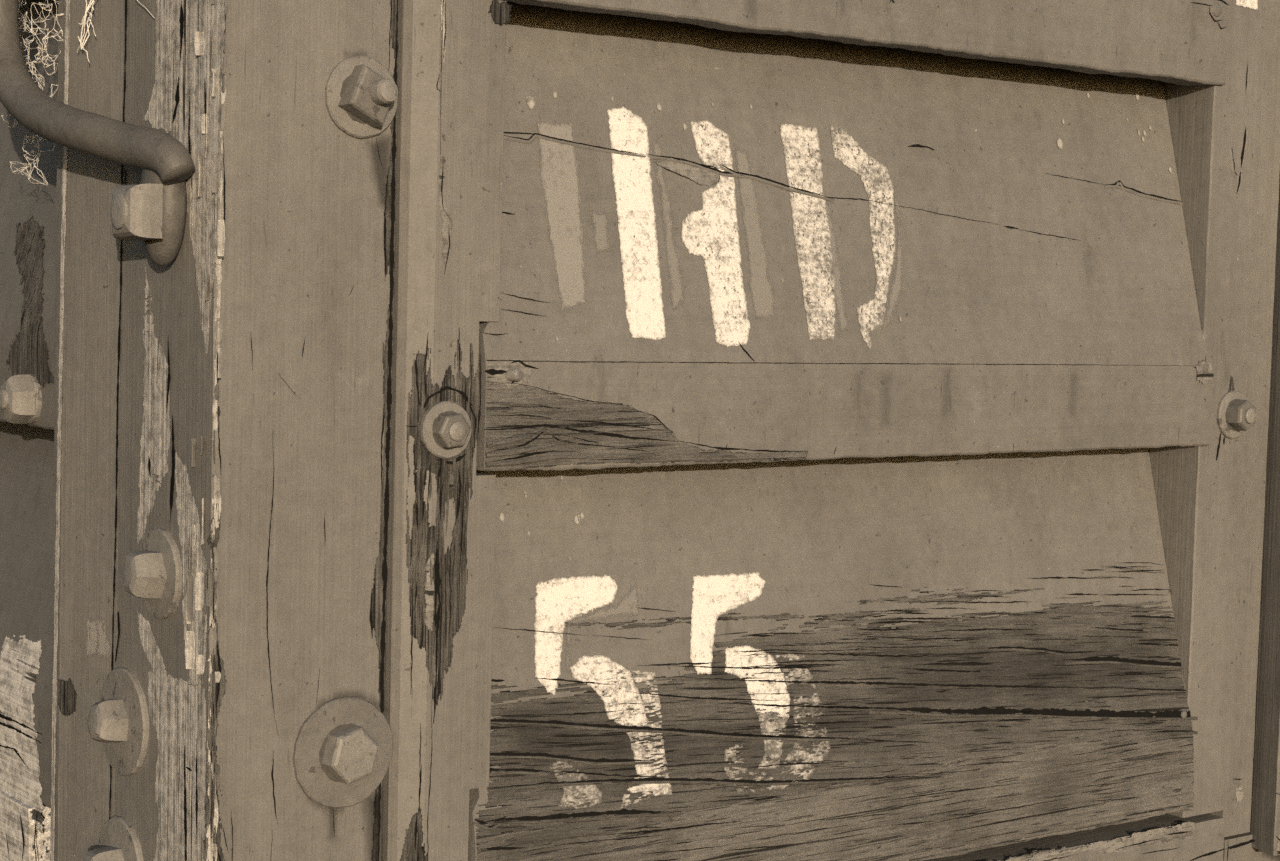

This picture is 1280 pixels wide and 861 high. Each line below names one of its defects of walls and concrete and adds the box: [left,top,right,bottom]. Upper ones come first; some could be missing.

peeling [389,0,399,93]
peeling [437,0,446,91]
peeling [438,154,453,270]
crack [503,132,1082,241]
crack [1047,173,1183,206]
peeling [137,0,228,861]
peeling [370,110,397,713]
peeling [485,358,538,387]
peeling [406,435,455,631]
peeling [371,783,381,861]
peeling [1006,822,1195,861]